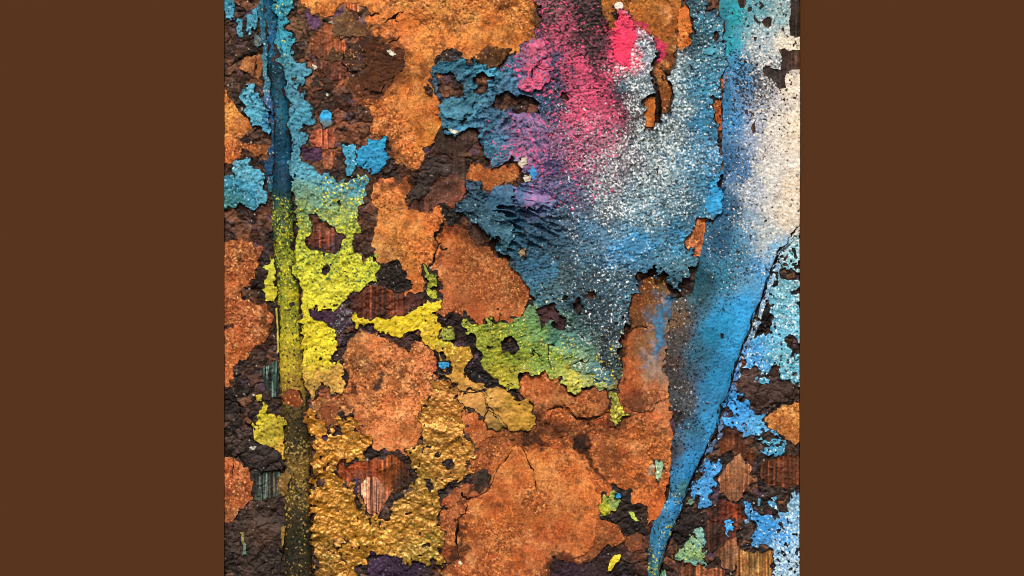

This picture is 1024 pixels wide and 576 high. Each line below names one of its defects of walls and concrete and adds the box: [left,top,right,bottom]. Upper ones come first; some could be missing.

corrosion [224,237,276,387]
corrosion [300,0,542,387]
peeling [224,0,800,576]
corrosion [436,272,674,576]